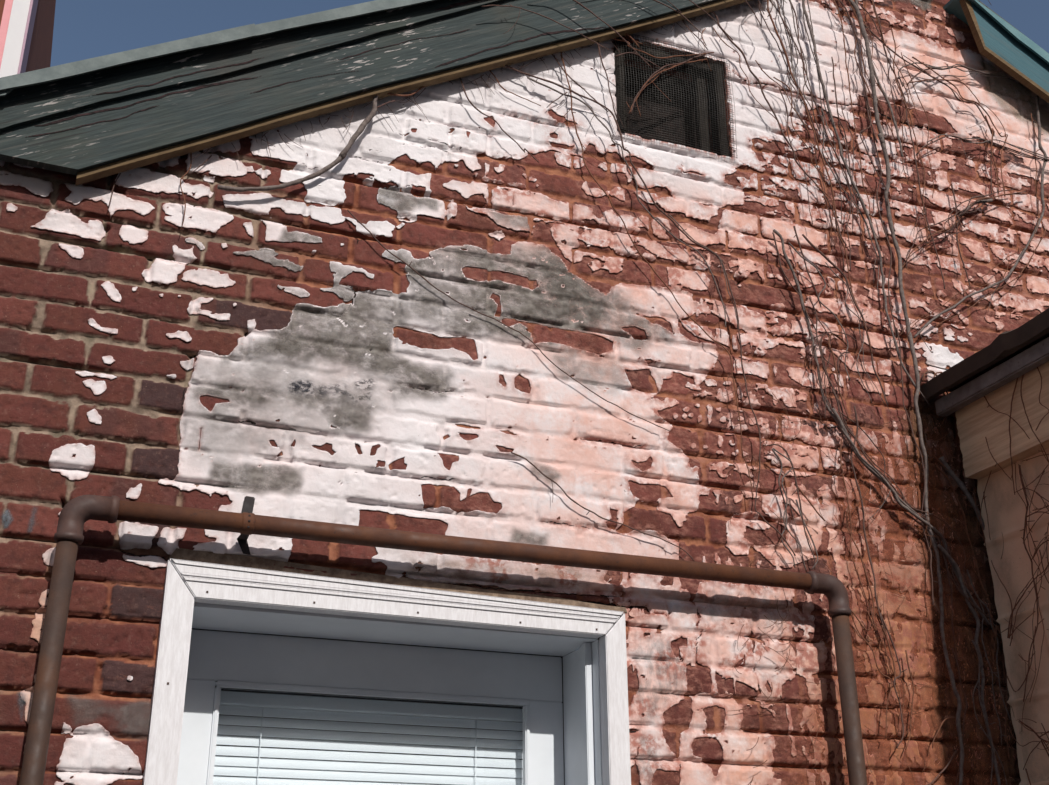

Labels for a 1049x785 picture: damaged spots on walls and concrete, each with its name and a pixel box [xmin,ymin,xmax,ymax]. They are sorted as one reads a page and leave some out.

peeling [115,139,271,199]
peeling [31,183,155,241]
peeling [142,237,236,288]
leakage [234,230,321,270]
peeling [158,0,1049,562]
leakage [243,246,665,429]
peeling [49,443,95,481]
leakage [211,464,300,492]
peeling [118,521,187,568]
peeling [709,402,961,785]
peeling [371,547,847,785]
peeling [54,722,143,785]